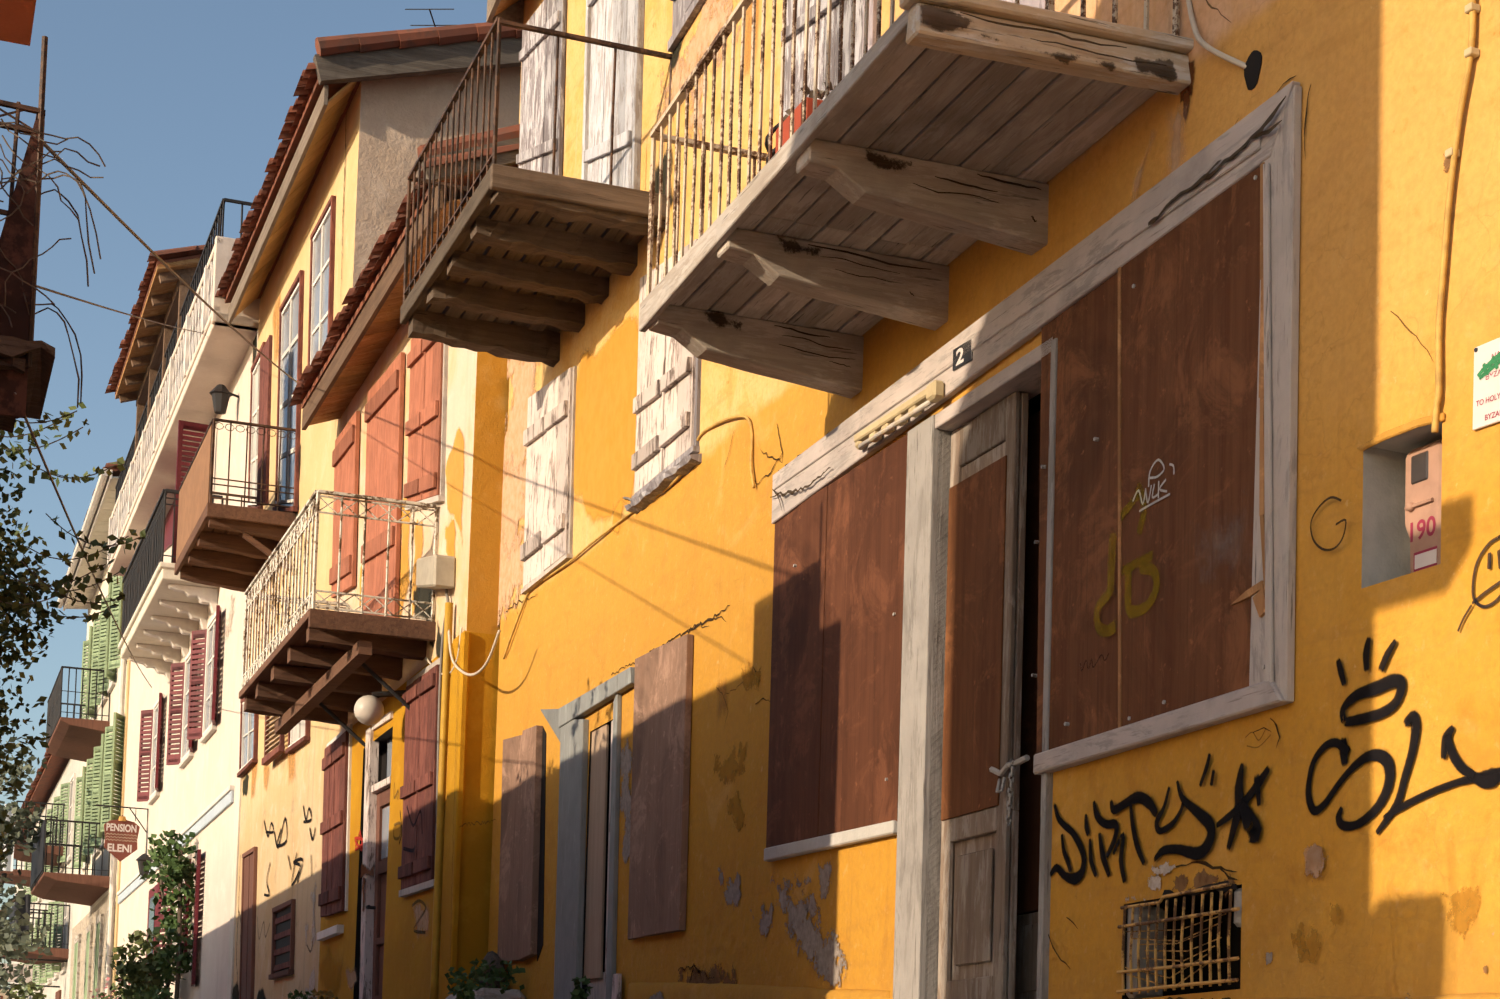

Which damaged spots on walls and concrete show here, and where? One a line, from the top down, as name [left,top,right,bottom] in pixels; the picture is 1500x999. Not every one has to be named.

peeling [497,359,539,627]
crack [725,412,856,509]
crack [611,605,730,675]
flaking render [741,662,762,691]
flaking render [714,742,746,832]
flaking render [718,861,847,988]
spalling [1125,861,1242,999]